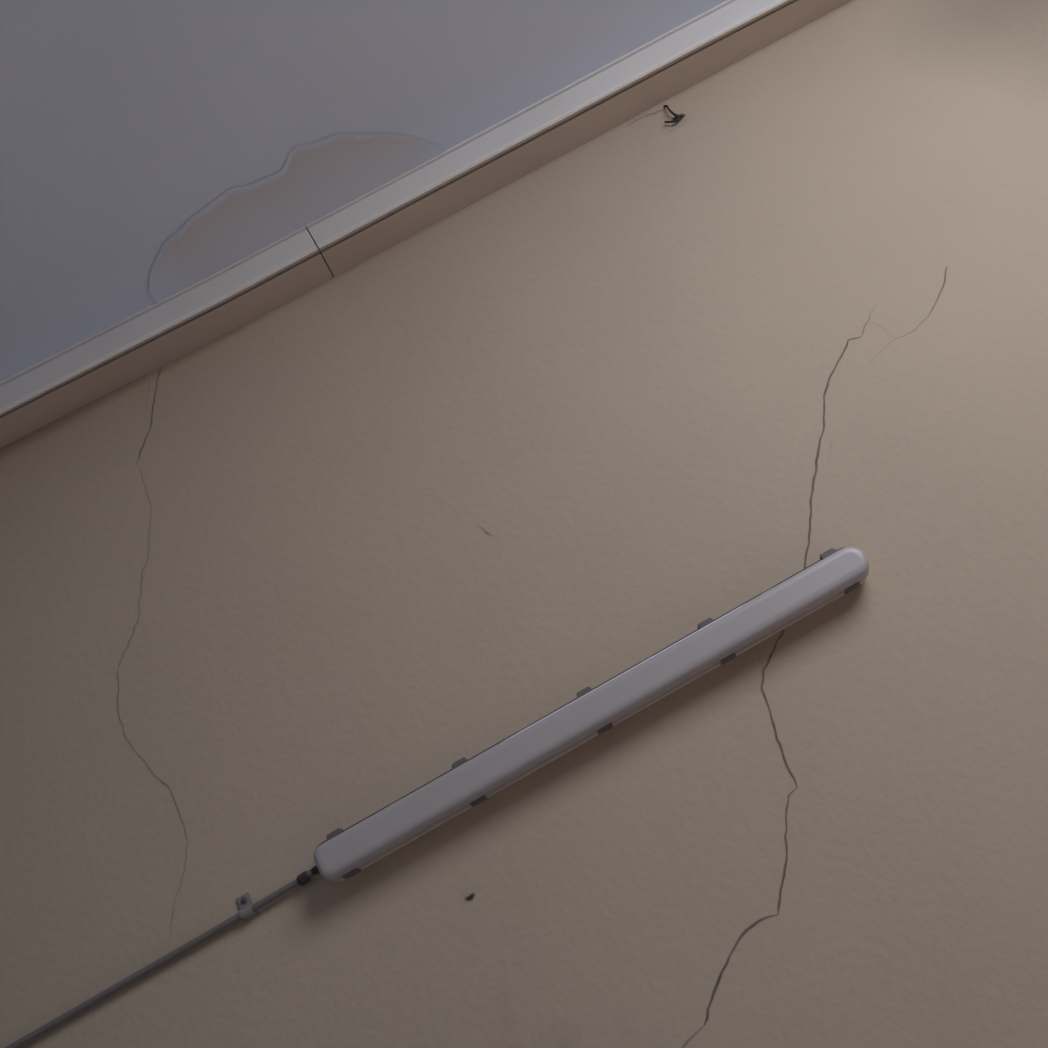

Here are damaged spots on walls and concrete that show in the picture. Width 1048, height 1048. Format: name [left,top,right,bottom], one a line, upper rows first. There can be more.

leakage [148,133,443,303]
crack [804,373,833,568]
crack [761,688,798,794]
crack [704,821,788,1025]